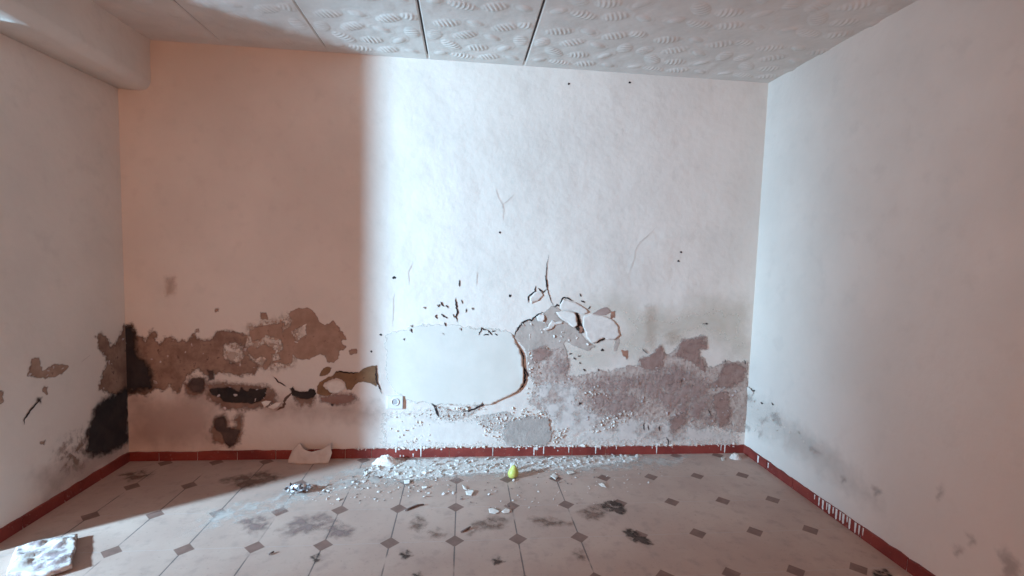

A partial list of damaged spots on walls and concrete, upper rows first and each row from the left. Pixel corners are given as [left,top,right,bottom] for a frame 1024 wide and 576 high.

crack [528,260,590,309]
peeling [27,358,69,379]
peeling [95,325,127,395]
leakage [60,325,259,466]
peeling [207,308,381,410]
peeling [514,299,620,371]